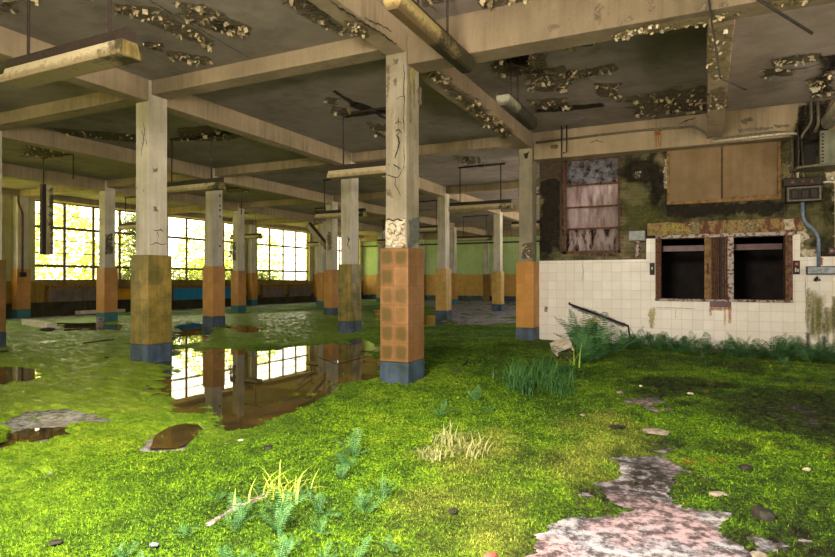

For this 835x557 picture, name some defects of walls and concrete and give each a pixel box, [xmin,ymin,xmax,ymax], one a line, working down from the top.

peeling [475,0,530,12]
peeling [47,127,136,144]
peeling [115,2,250,67]
peeling [177,125,241,142]
crack [386,64,405,196]
peeling [429,71,513,139]
peeling [490,3,748,120]
peeling [759,53,822,80]
peeling [805,71,835,100]
water stain [618,153,785,219]
peeling [385,219,406,248]
water stain [787,298,835,352]